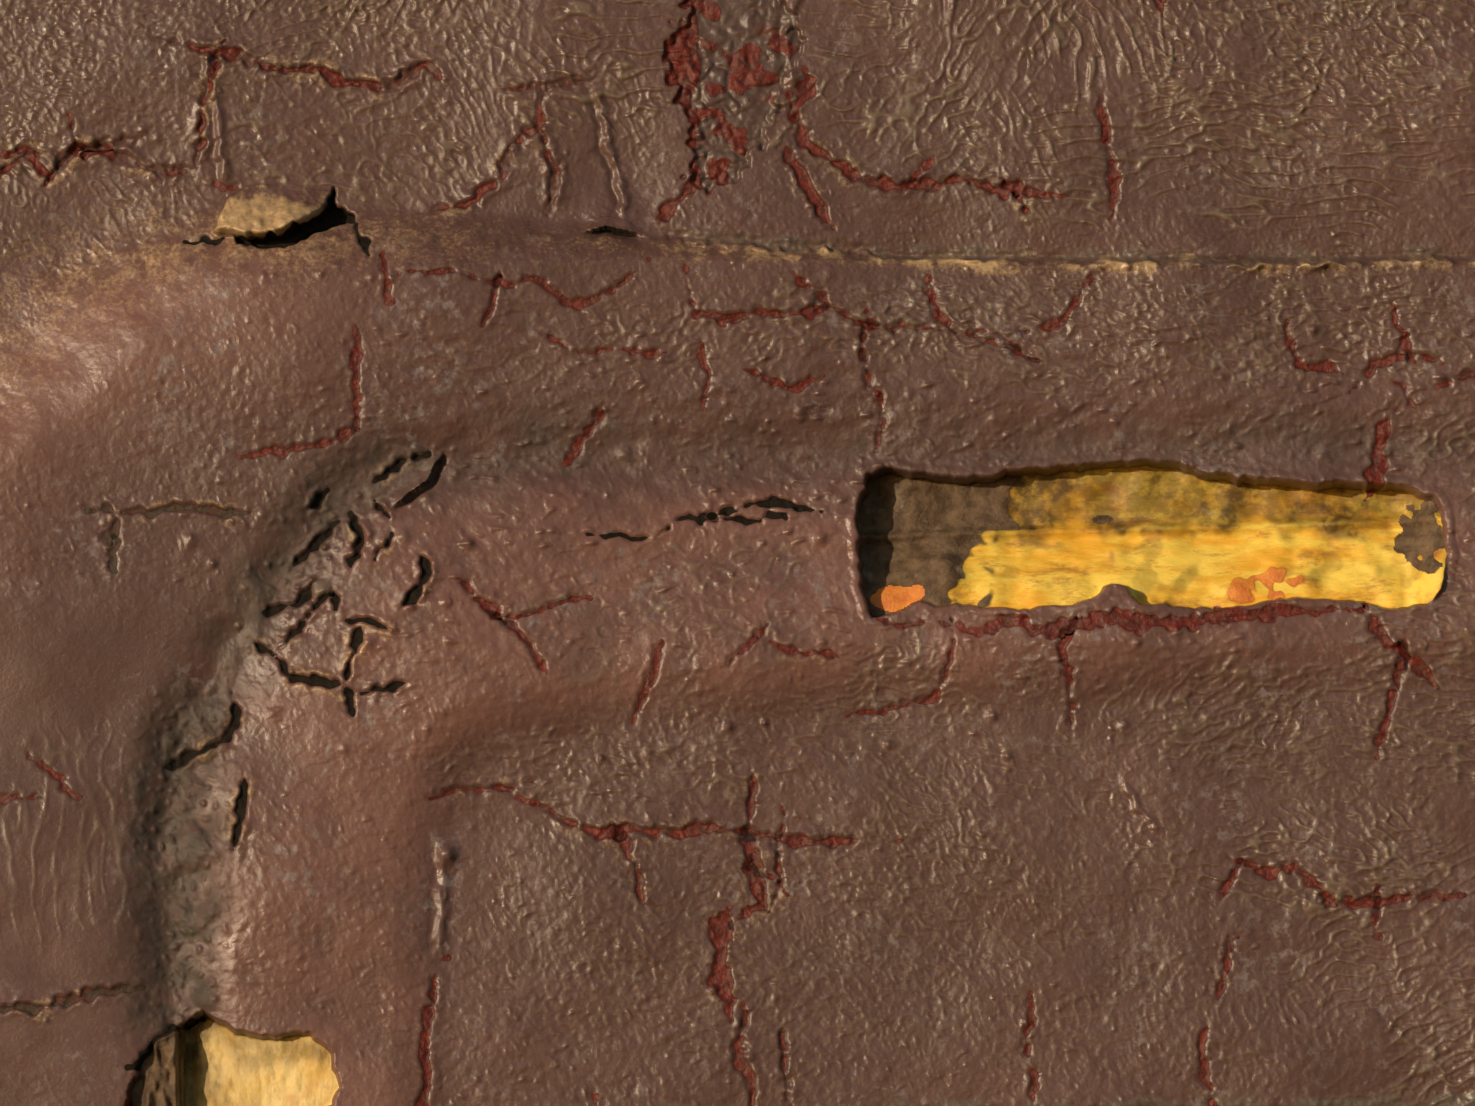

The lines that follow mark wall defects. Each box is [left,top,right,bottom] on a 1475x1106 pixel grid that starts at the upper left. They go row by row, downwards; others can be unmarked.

crack [0,112,115,186]
peeling [182,184,371,257]
crack [162,38,441,192]
crack [783,90,1068,230]
crack [379,250,1094,452]
crack [1285,303,1475,502]
crack [256,451,593,717]
crack [585,496,823,541]
spalling [858,466,1447,641]
crack [428,774,855,1106]
crack [1219,857,1467,941]
spalling [124,1016,339,1106]